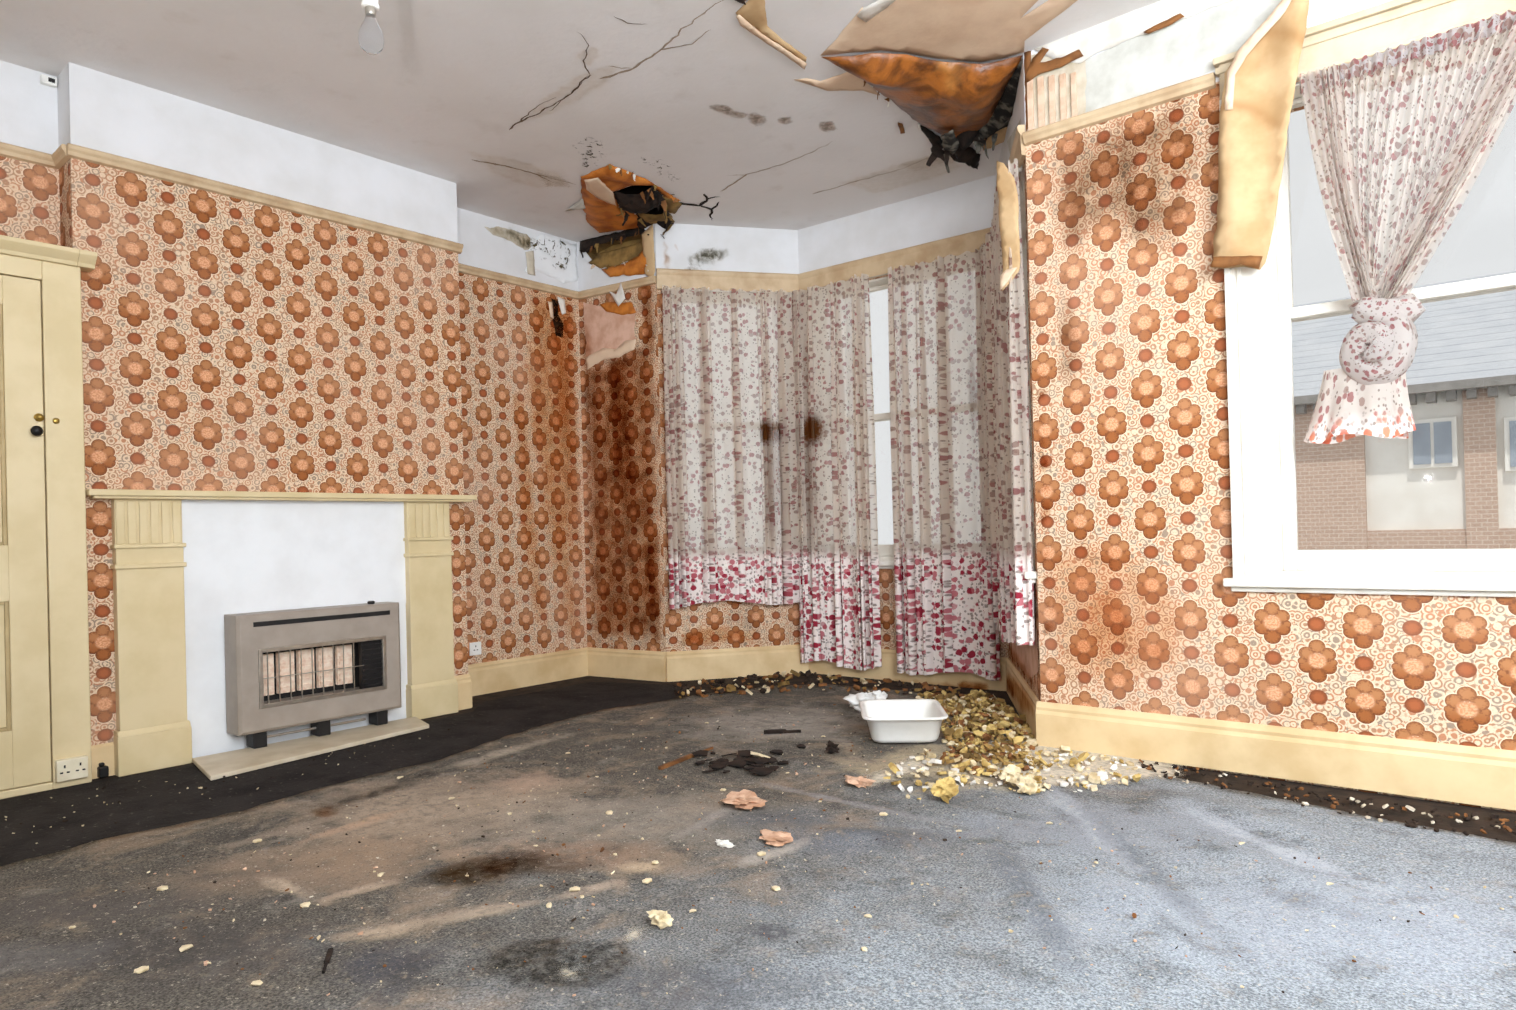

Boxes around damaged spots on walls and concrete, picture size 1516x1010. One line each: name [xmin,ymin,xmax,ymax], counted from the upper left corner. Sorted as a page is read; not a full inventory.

spalling [485,164,679,357]
crack [474,0,723,184]
peeling [996,118,1023,291]
peeling [1210,0,1309,270]